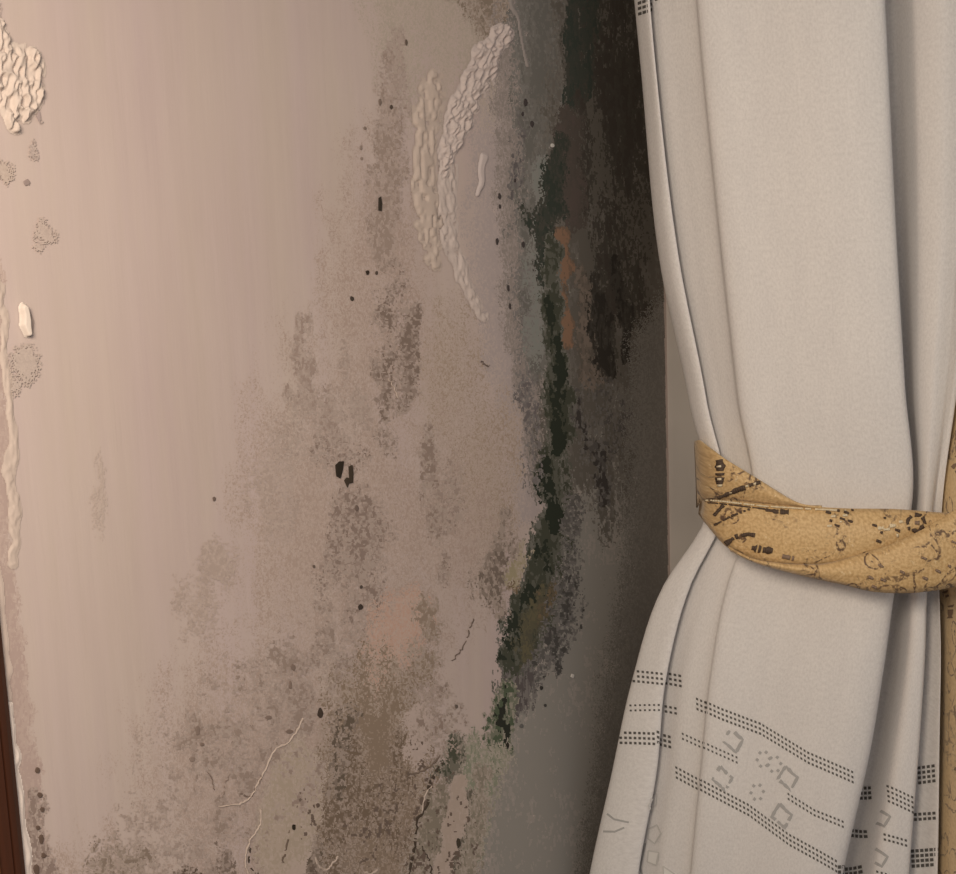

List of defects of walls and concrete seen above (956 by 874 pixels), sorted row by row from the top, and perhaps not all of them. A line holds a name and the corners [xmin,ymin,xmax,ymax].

damp [0,0,668,874]
crack [409,755,444,874]